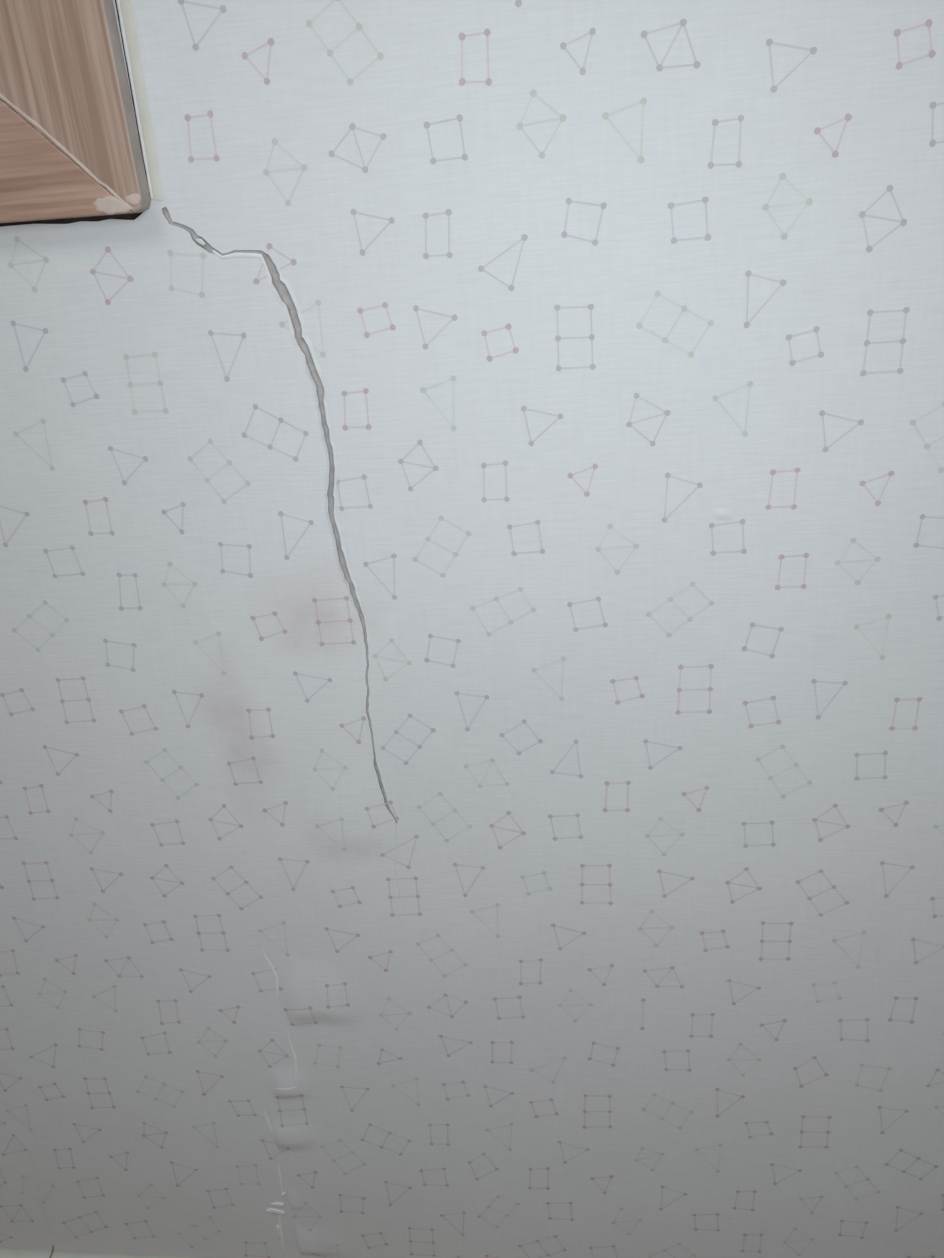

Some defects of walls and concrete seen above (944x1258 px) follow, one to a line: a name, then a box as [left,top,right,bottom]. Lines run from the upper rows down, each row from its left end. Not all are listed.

crack [162,207,400,897]